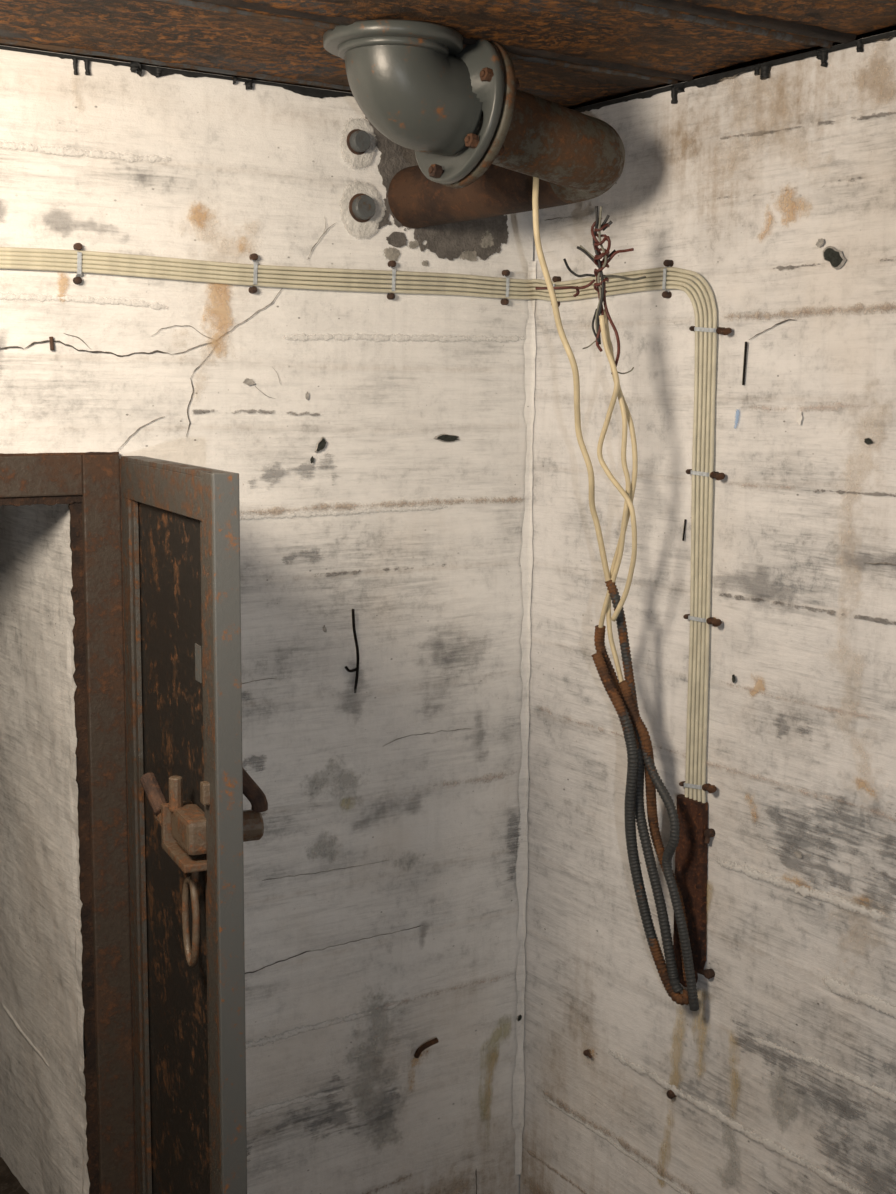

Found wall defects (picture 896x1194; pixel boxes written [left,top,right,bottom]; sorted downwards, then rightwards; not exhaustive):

corrosion [203,279,231,352]
crack [0,289,282,451]
crack [245,925,423,974]